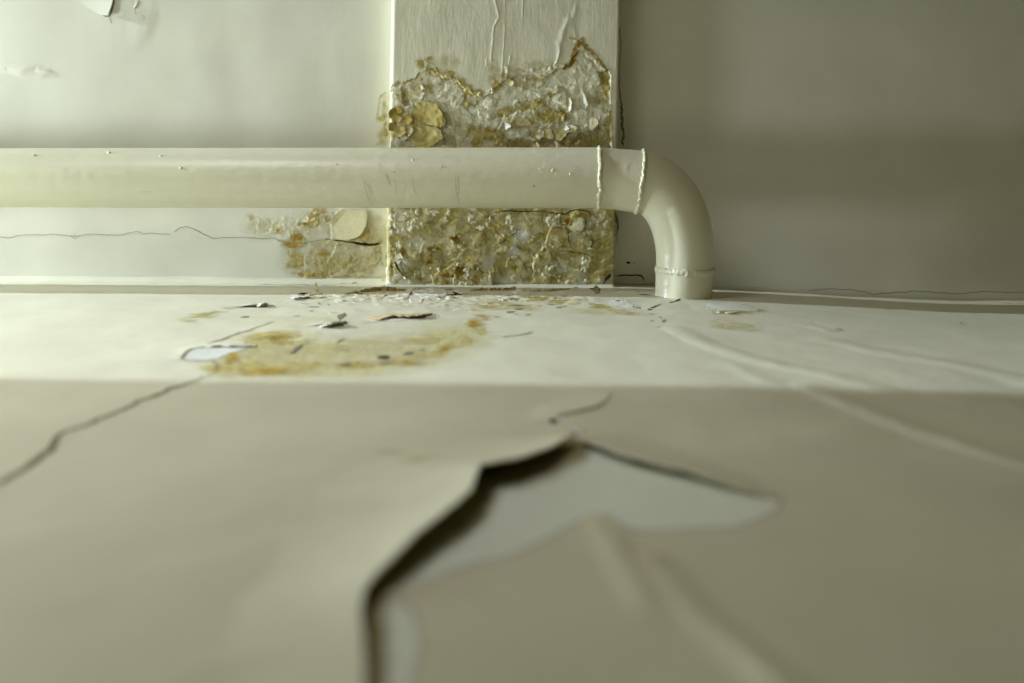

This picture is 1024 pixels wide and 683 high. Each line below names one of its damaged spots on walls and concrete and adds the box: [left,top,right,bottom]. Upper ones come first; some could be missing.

peeling [388,51,611,148]
crack [0,226,403,295]
peeling [168,321,274,370]
damp [210,208,616,376]
spalling [289,208,637,315]
crack [0,368,219,484]